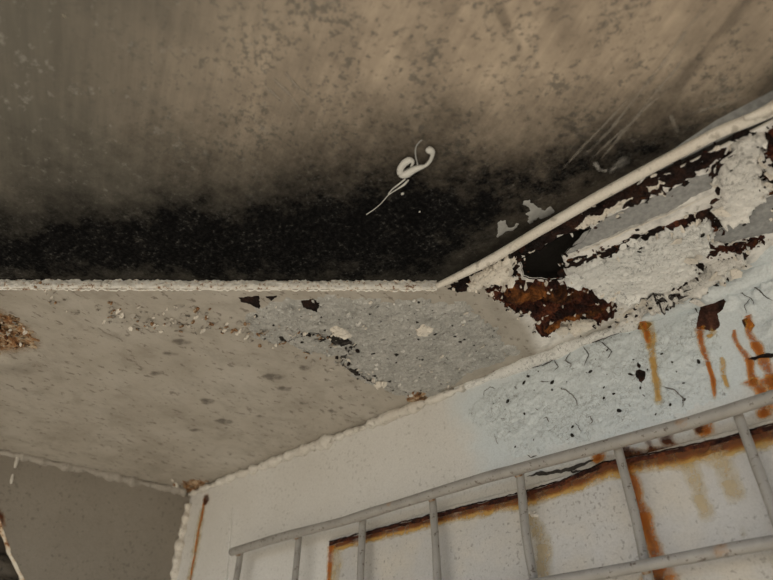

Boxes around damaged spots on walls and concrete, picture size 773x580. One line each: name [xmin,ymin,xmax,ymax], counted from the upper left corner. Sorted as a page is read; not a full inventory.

corrosion [758,126,773,195]
corrosion [0,313,40,355]
spalling [0,279,437,366]
corrosion [445,278,471,293]
peeling [460,251,521,294]
corrosion [485,142,770,338]
corrosion [638,321,662,401]
peeling [555,126,773,338]
corrosion [697,299,729,396]
corrosion [732,314,773,395]
corrosion [171,479,209,580]
corrosion [622,435,675,558]